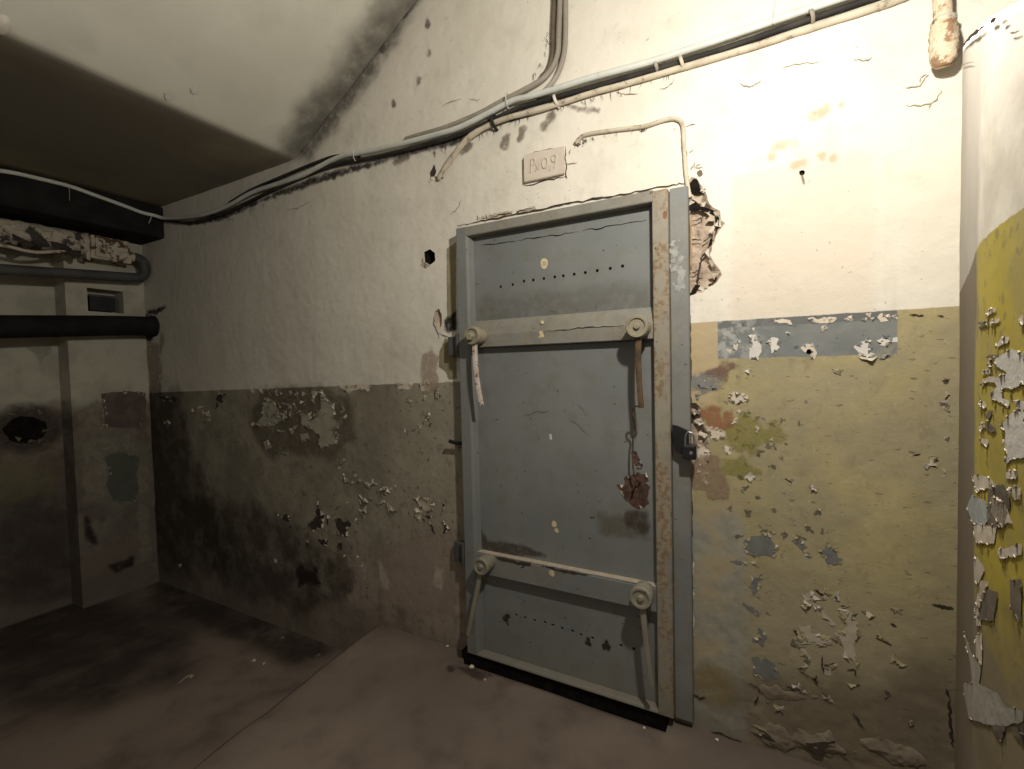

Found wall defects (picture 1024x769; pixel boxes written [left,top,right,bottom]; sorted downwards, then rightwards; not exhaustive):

mould [297,4,412,155]
crack [906,74,942,108]
peeling [727,319,792,373]
peeling [801,343,817,359]
peeling [808,313,898,361]
peeling [978,307,1000,328]
peeling [250,384,398,567]
corrosion [617,451,650,509]
spalling [691,380,804,517]
peeling [963,336,1024,744]
peeling [730,509,843,681]
peeling [791,587,876,676]